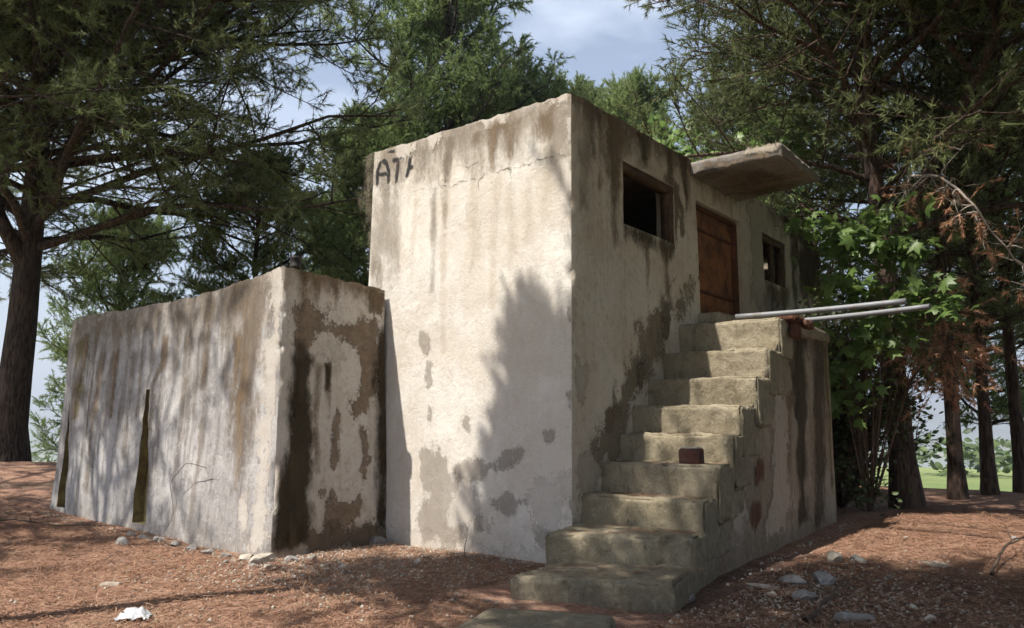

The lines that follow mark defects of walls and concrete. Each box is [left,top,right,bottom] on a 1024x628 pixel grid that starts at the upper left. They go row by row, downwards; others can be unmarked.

damp [490,122,513,166]
damp [72,323,122,420]
damp [139,333,168,392]
damp [229,281,264,490]
peeling [238,267,386,554]
damp [766,216,834,527]
peeling [423,482,546,564]